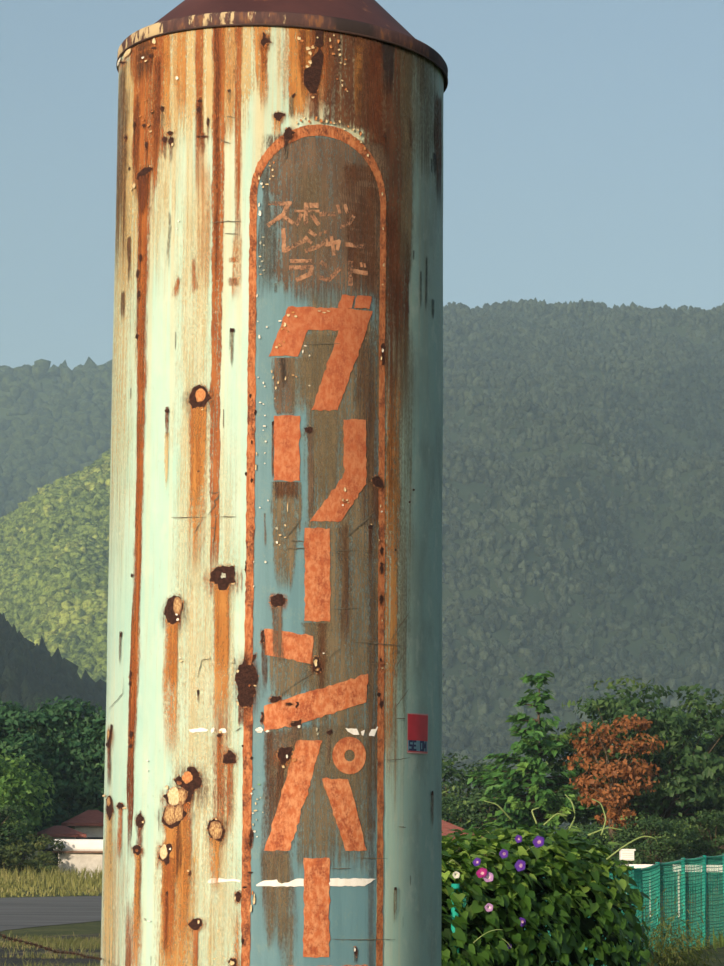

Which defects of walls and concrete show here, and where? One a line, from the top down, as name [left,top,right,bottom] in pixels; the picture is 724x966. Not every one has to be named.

corrosion [105,26,270,845]
corrosion [281,27,410,771]
corrosion [125,909,133,966]
peeling [329,878,374,886]